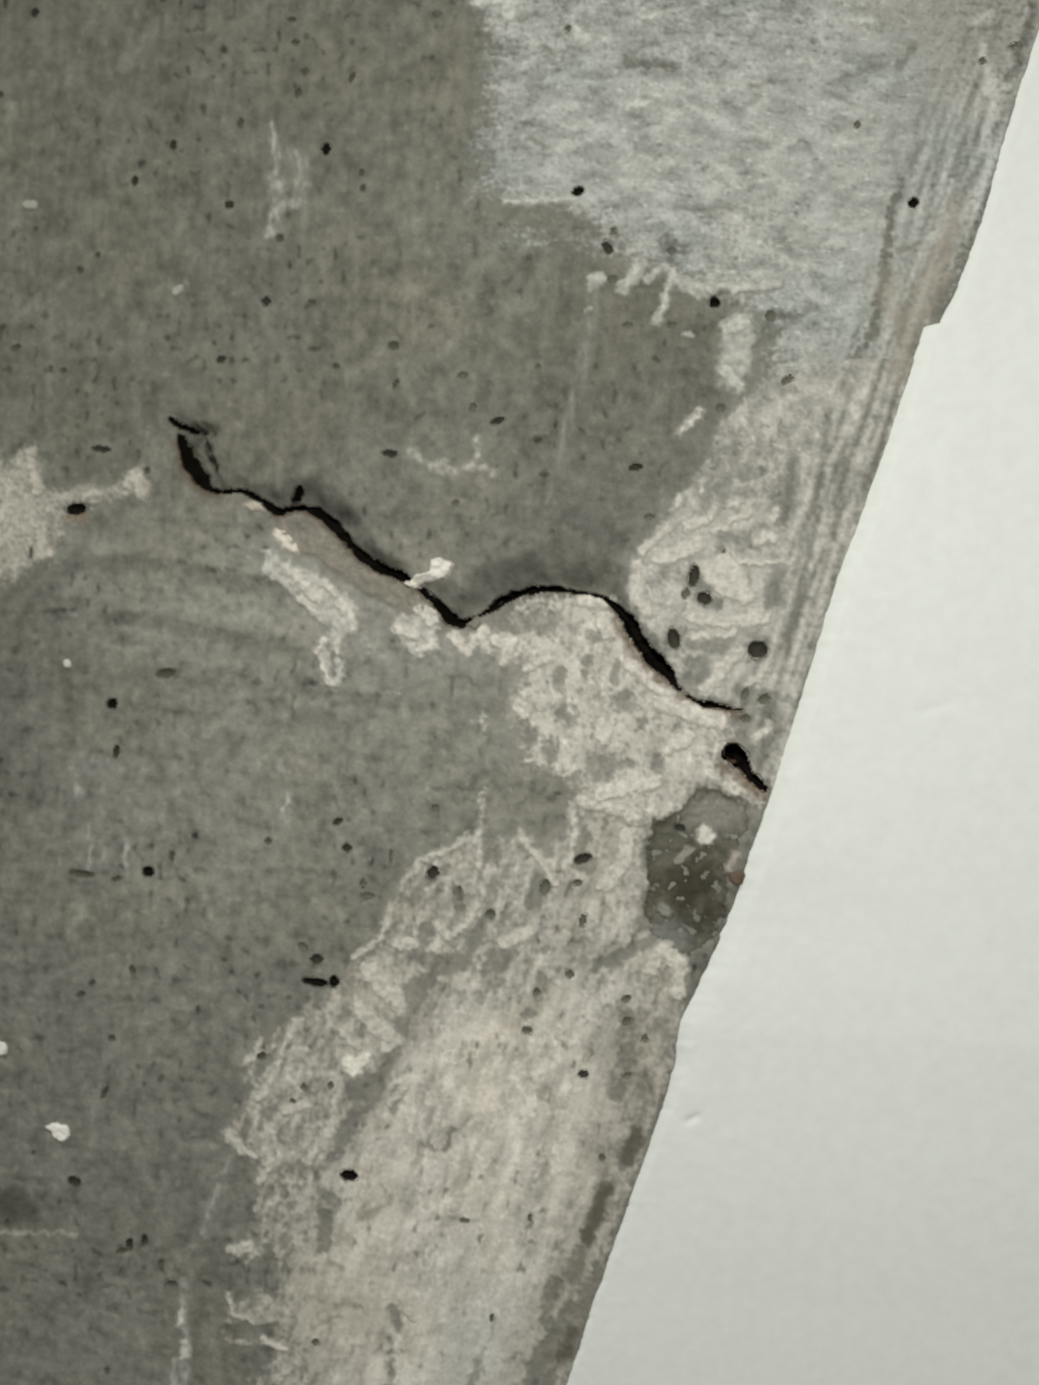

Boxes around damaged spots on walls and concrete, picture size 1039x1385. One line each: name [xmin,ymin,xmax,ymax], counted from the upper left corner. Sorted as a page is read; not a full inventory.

crack [167,416,769,793]